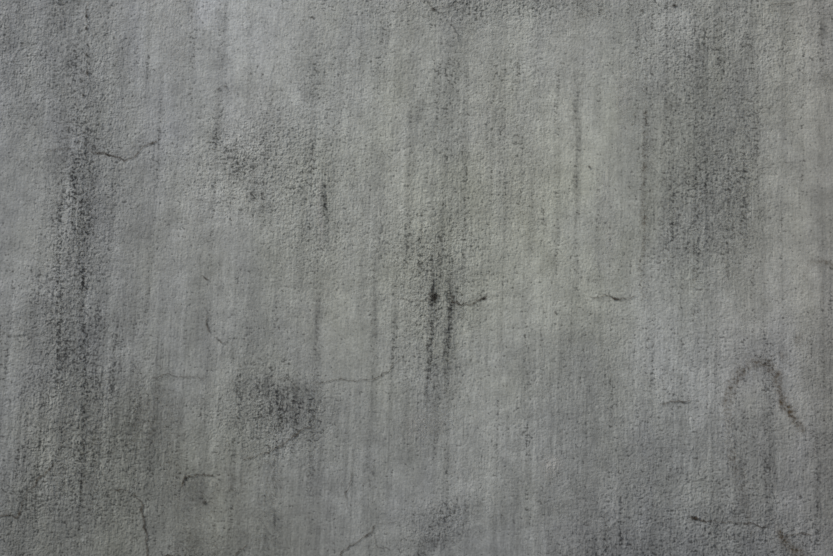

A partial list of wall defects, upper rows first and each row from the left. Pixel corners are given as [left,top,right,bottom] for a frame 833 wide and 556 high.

crack [116,489,173,556]